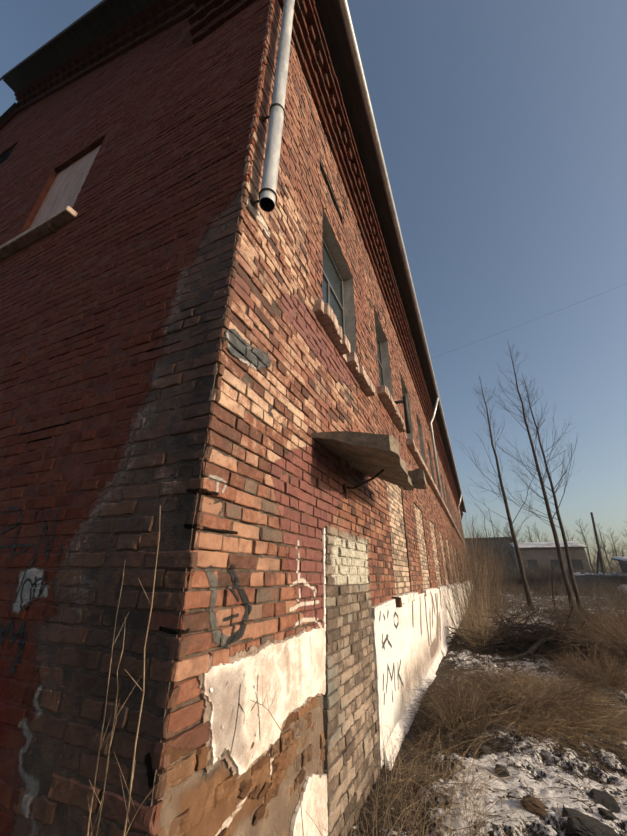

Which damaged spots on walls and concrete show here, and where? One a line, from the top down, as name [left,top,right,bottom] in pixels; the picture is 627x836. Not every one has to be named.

peeling [10,184,333,836]